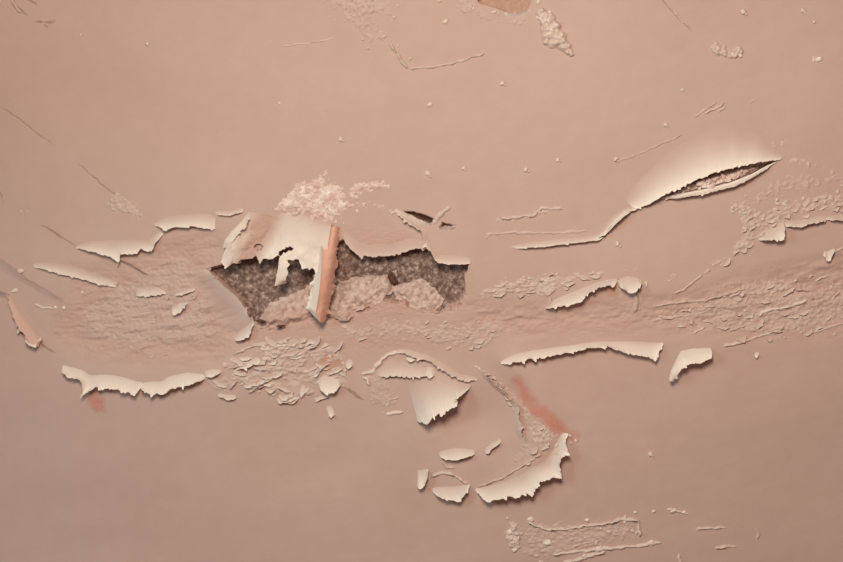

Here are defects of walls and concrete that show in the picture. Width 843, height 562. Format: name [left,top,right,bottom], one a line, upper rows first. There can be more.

flaking render [454,0,575,57]
peeling [485,205,587,240]
peeling [0,259,67,353]
flaking render [33,208,577,503]
peeling [501,341,663,365]